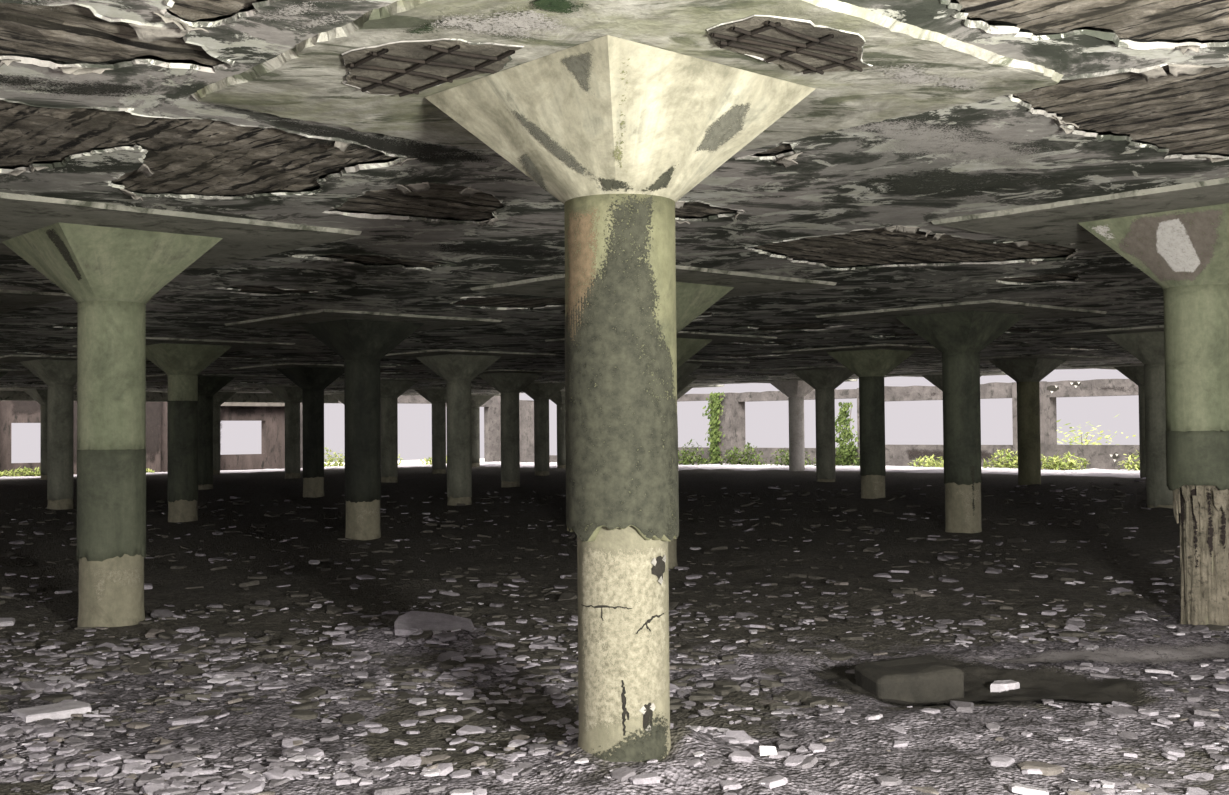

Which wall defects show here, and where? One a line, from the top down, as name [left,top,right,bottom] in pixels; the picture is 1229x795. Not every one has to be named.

spalling [0,0,282,76]
spalling [342,38,524,97]
spalling [707,15,873,75]
spalling [939,0,1229,163]
spalling [0,98,417,202]
spalling [734,142,803,169]
spalling [321,182,511,227]
spalling [675,200,746,225]
spalling [743,225,1087,285]
peeling [1156,218,1201,273]
peeling [580,544,666,734]
crack [621,680,630,736]